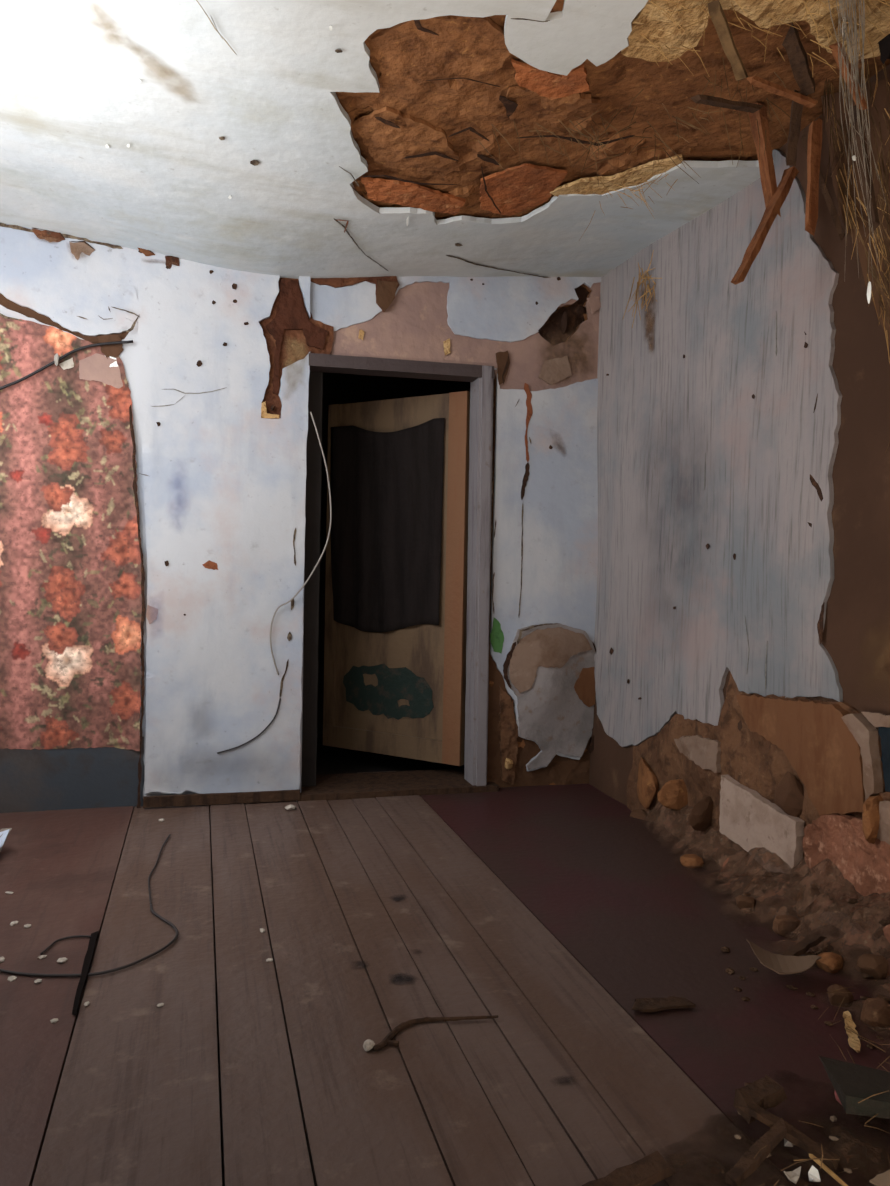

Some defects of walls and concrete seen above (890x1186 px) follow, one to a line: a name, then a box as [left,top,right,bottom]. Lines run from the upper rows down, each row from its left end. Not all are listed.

spalling [335,0,890,239]
flaking render [33,228,95,260]
flaking render [244,276,609,419]
peeling [810,475,823,502]
spalling [487,618,590,788]
peeling [861,712,890,792]